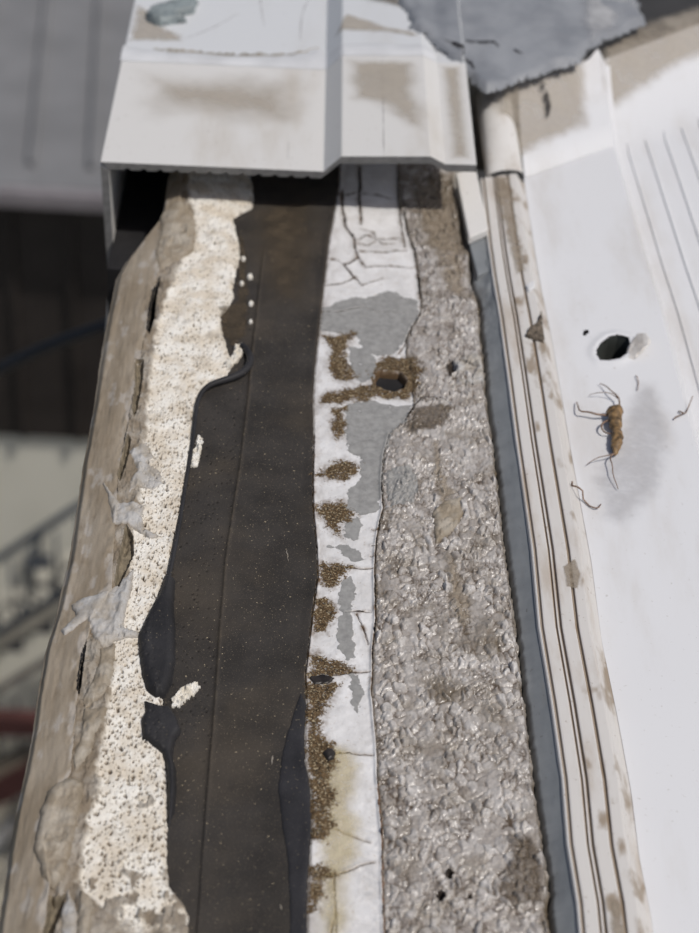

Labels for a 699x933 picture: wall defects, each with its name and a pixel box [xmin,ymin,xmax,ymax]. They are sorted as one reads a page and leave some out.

damp [359,63,412,115]
crack [322,166,422,354]
peeling [326,399,418,562]
peeling [336,576,356,660]
peeling [348,673,364,713]